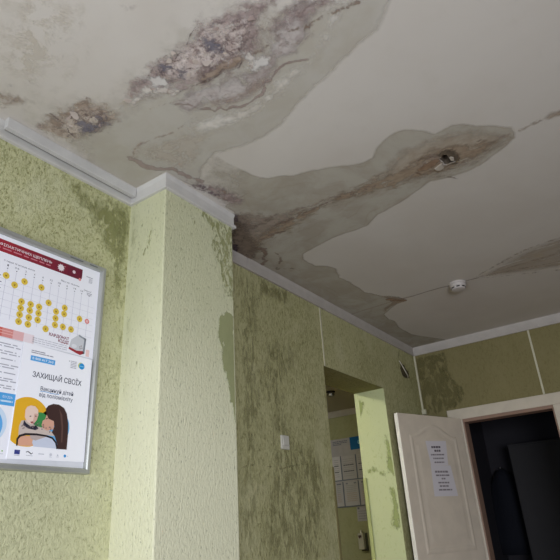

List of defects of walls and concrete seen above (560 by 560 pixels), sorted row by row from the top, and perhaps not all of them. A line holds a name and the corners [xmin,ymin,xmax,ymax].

peeling [123,0,275,106]
peeling [40,100,116,139]
water stain [73,0,514,348]
spalling [387,134,503,180]
water stain [219,312,236,423]
water stain [417,353,463,413]